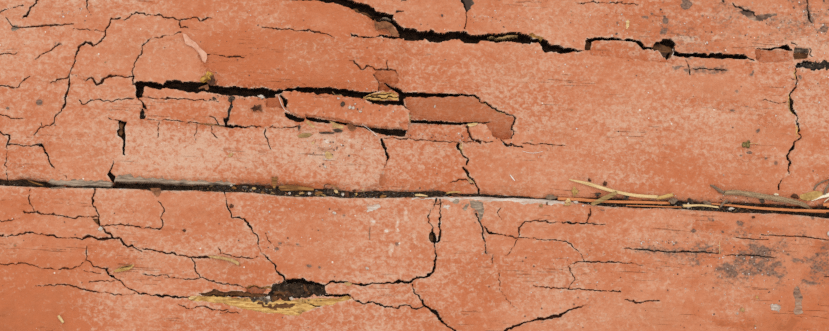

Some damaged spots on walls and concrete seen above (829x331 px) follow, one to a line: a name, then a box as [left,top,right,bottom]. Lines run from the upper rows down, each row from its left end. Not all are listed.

crack [0,0,565,192]
peeling [281,90,514,139]
crack [262,0,829,190]
crack [0,189,286,314]